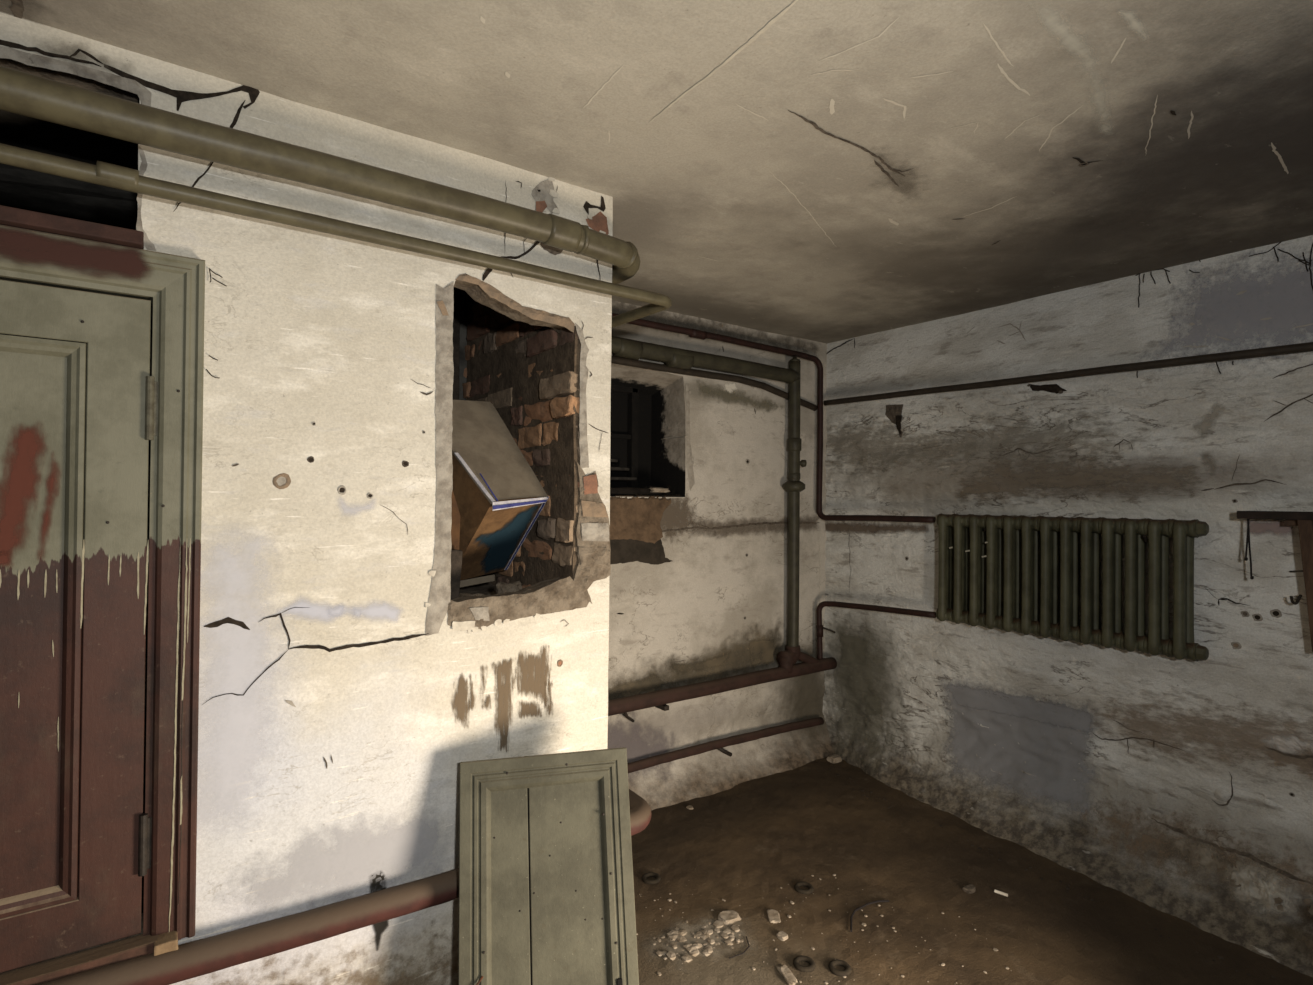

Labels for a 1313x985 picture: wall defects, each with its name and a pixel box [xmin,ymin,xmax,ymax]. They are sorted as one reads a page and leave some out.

crack [173,162,213,212]
crack [229,100,245,128]
crack [788,110,914,187]
spalling [422,274,672,636]
crack [202,607,429,705]
water stain [608,625,781,700]
water stain [828,627,895,760]
water stain [607,724,669,773]
water stain [947,685,1313,780]
water stain [325,934,449,985]